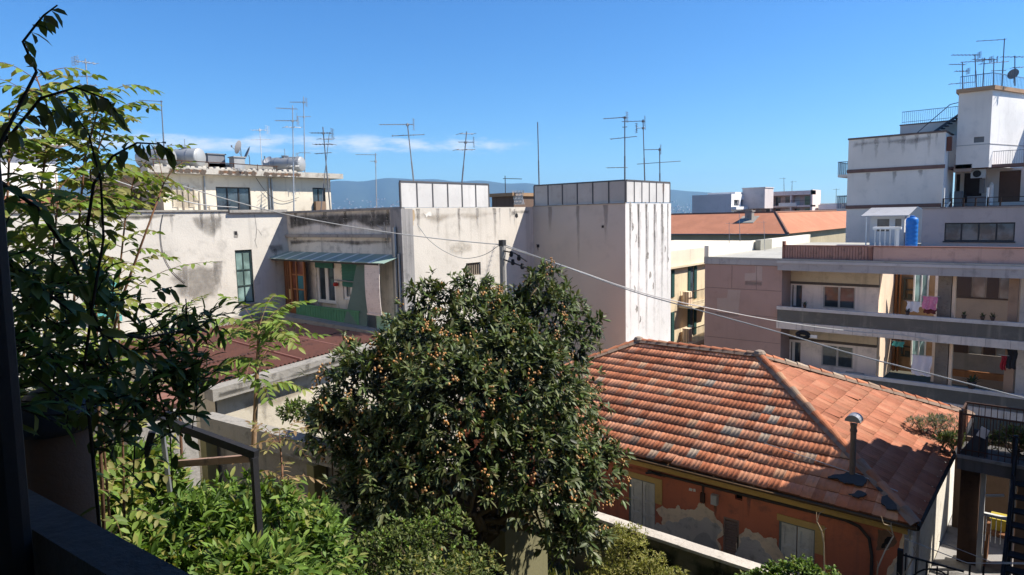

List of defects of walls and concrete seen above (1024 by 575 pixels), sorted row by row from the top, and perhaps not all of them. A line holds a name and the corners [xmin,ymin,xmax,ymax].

damp [195,213,219,233]
flaking render [654,488,724,551]
flaking render [735,528,785,565]